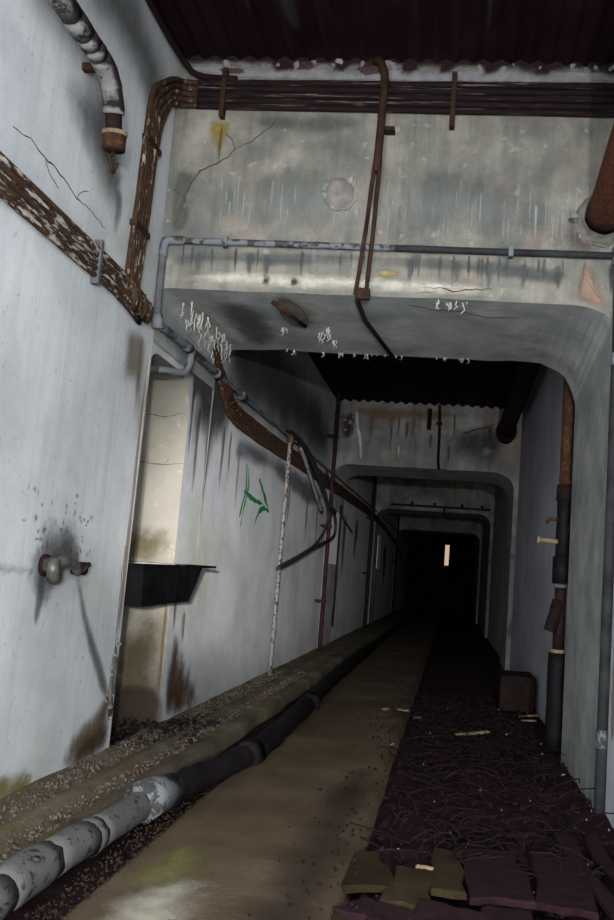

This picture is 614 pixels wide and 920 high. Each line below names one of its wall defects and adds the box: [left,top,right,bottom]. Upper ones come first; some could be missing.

crack [13,126,103,227]
crack [173,116,280,218]
leakage [208,256,471,315]
leakage [179,302,288,363]
leakage [189,371,320,503]
leakage [37,534,77,559]
leakage [35,571,51,619]